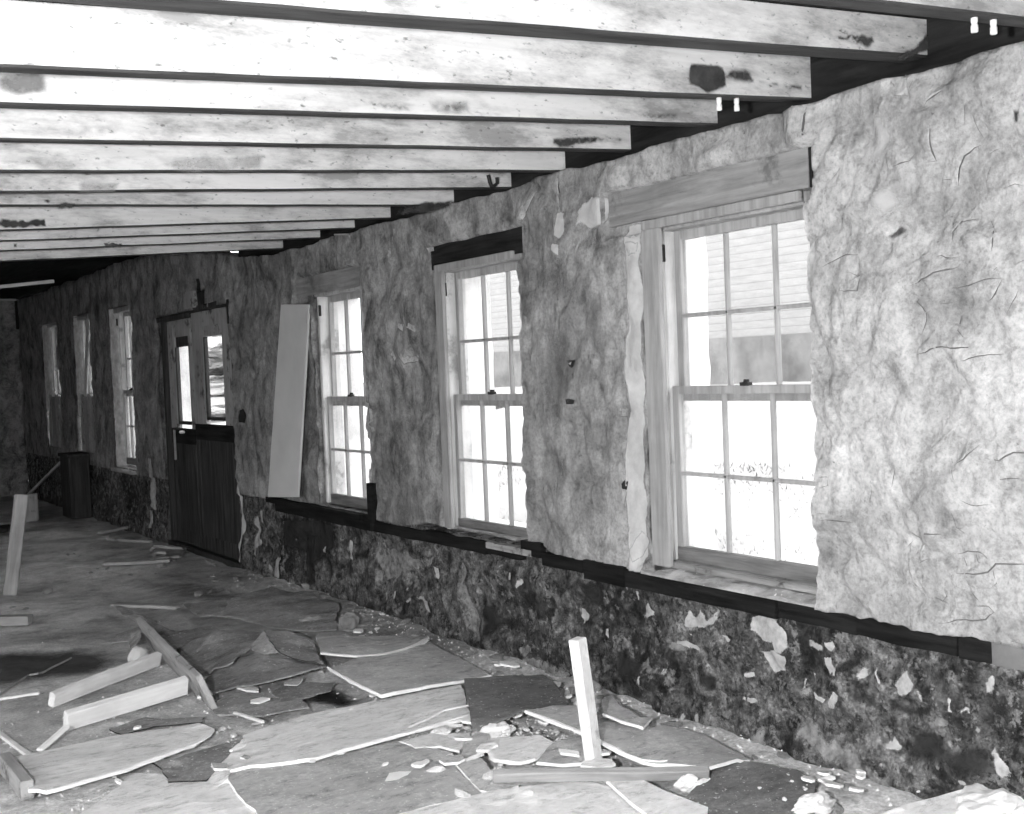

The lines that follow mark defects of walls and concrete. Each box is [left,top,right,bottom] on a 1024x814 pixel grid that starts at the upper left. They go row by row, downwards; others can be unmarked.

leakage [839,35,873,47]
leakage [898,35,928,60]
leakage [0,74,43,93]
leakage [689,64,753,93]
leakage [554,137,597,147]
leakage [0,219,46,228]
flaking render [551,197,609,255]
crack [892,75,1024,372]
crack [821,240,867,305]